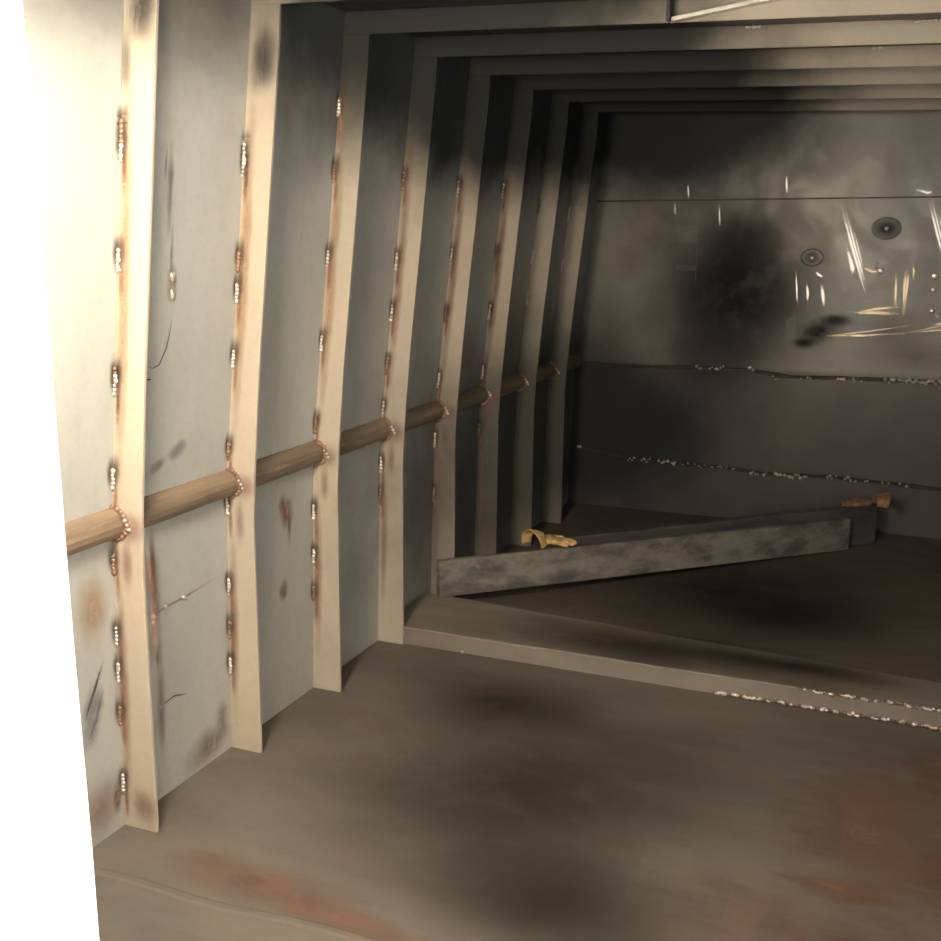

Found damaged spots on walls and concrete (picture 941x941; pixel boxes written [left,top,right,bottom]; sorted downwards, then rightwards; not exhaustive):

corrosion [117,112,127,183]
corrosion [240,137,248,197]
corrosion [114,221,127,326]
corrosion [234,211,248,321]
corrosion [319,160,338,365]
corrosion [111,364,120,411]
corrosion [108,463,118,506]
corrosion [109,550,129,590]
corrosion [311,545,319,613]
corrosion [225,575,236,687]
corrosion [113,622,126,742]
corrosion [115,770,128,810]